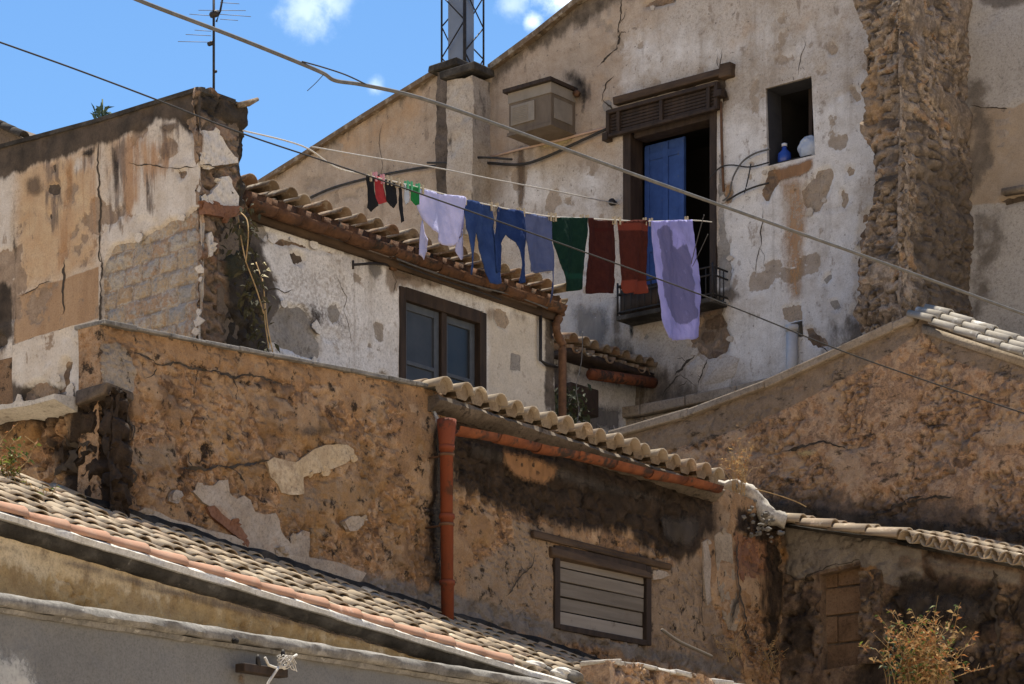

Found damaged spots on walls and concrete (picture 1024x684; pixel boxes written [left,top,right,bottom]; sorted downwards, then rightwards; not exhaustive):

crack [599,0,626,109]
damp [27,178,40,194]
crack [131,163,239,176]
flaking render [761,165,780,201]
flaking render [794,168,849,216]
crack [95,145,103,320]
corrosion [774,160,813,295]
flaking render [691,154,734,359]
peeling [191,308,205,336]
crack [135,352,281,399]
crack [661,355,708,398]
damp [661,517,699,546]